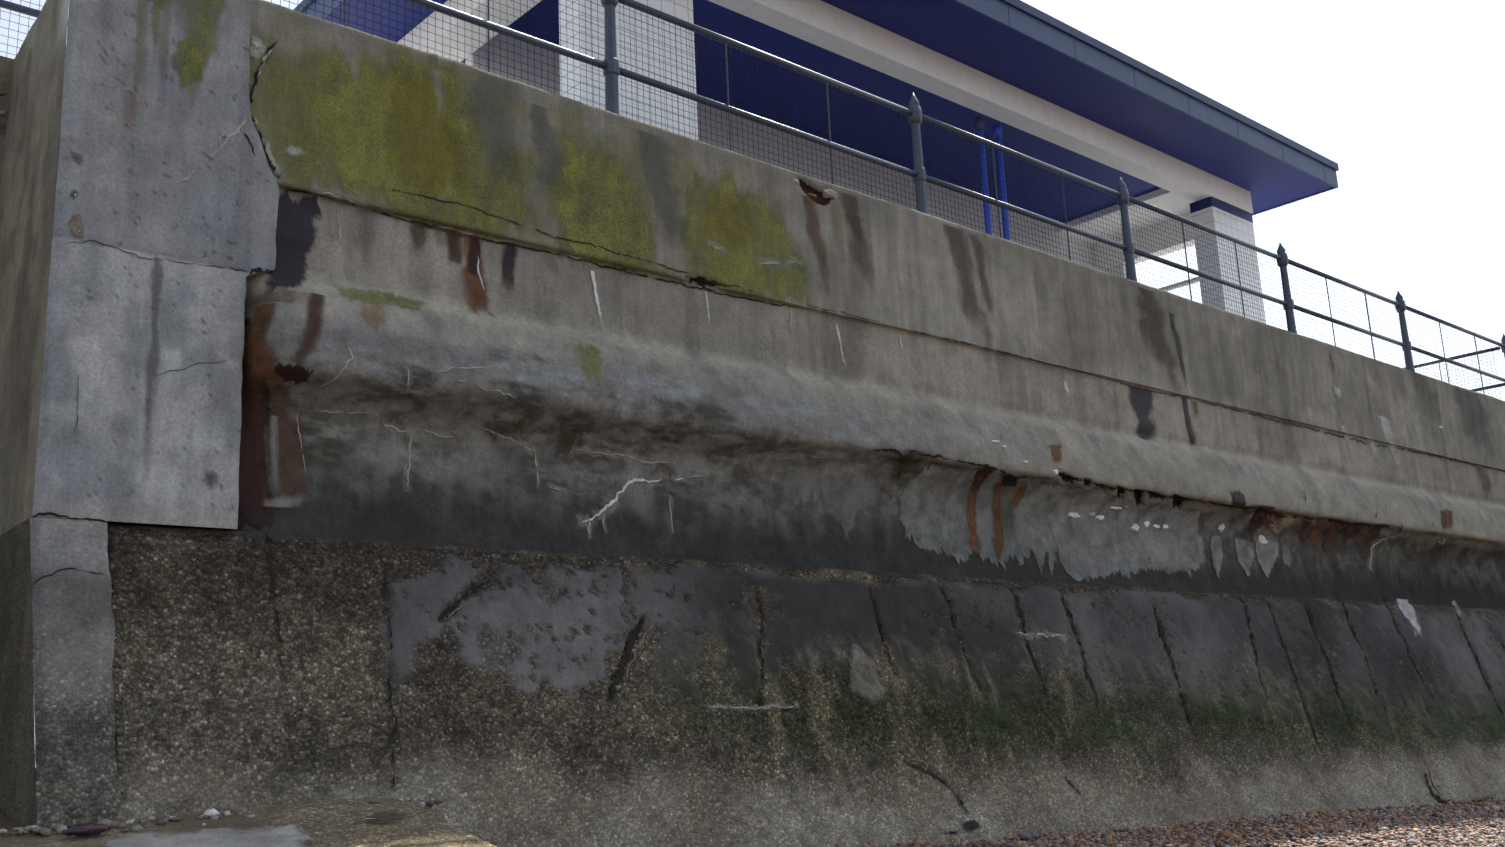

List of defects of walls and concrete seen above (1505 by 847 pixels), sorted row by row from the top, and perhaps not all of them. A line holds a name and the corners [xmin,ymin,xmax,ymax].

water stain [266,190,321,291]
rust [448,229,486,311]
spalling [790,178,840,205]
water stain [842,192,859,229]
water stain [1139,287,1185,377]
rust [238,293,322,530]
crack [316,347,709,533]
water stain [1129,385,1155,439]
water stain [1182,397,1197,444]
rust [967,466,1026,558]
peeling [899,461,1394,581]
rust [1240,505,1282,536]